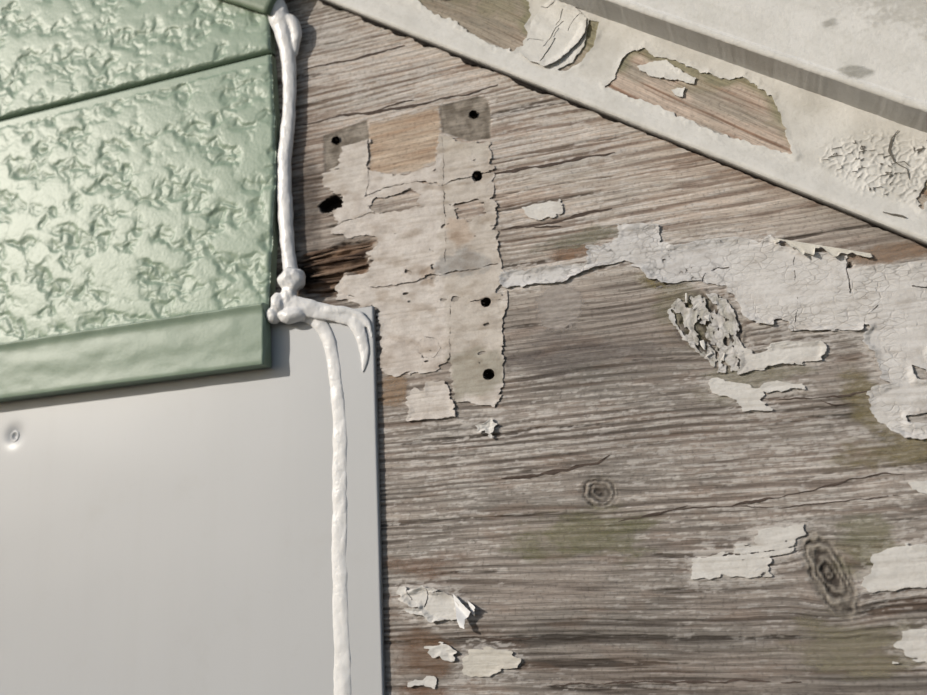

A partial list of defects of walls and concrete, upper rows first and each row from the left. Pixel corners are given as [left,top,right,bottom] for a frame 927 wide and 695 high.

peeling [418,0,599,71]
peeling [605,48,792,154]
crack [823,131,927,218]
peeling [322,134,927,440]
peeling [691,524,806,580]
peeling [861,543,927,593]
peeling [396,585,475,629]
peeling [407,676,437,689]
peeling [424,642,521,677]
peeling [892,629,927,664]